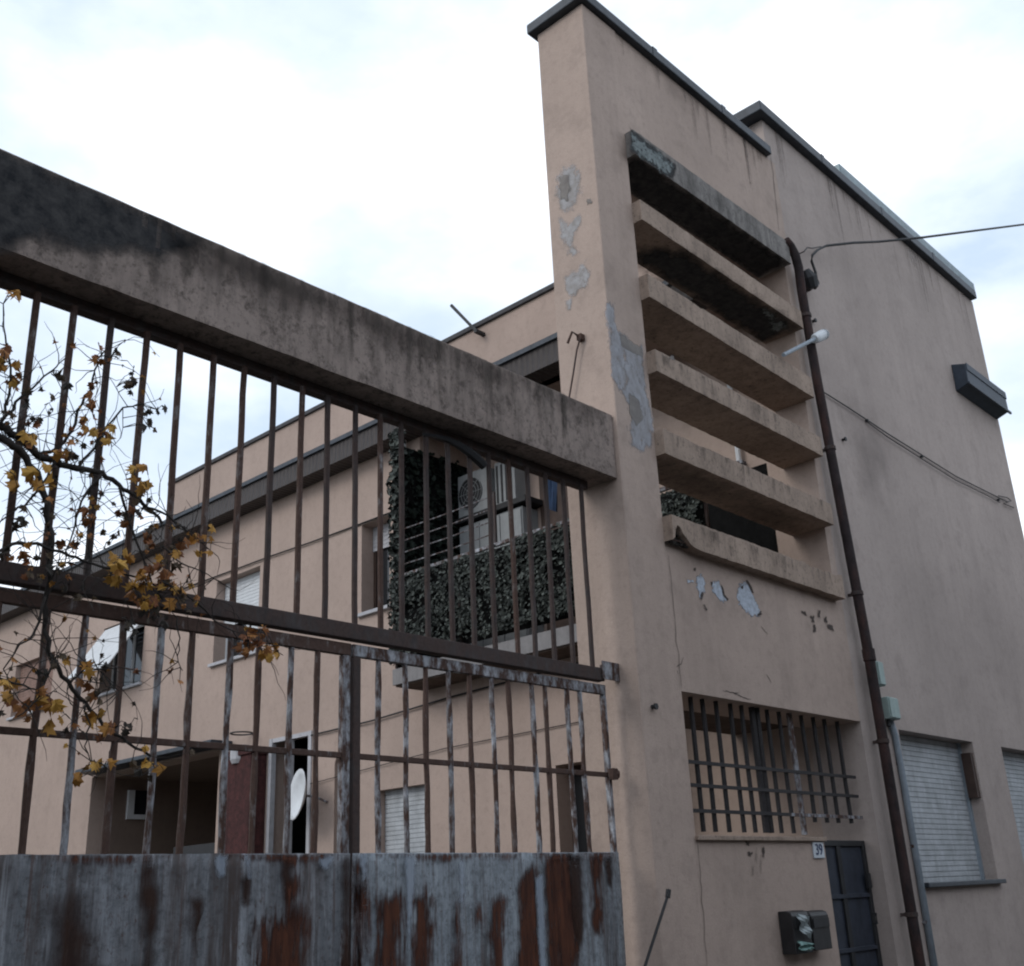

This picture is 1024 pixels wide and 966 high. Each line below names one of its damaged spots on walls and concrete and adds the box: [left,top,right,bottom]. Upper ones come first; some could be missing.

damp [0,149,200,258]
peeling [556,167,592,310]
peeling [605,303,654,451]
peeling [687,568,762,617]
corrosion [44,855,170,966]
corrosion [193,900,202,933]
corrosion [222,854,434,966]
corrosion [377,853,520,862]
corrosion [452,853,613,966]